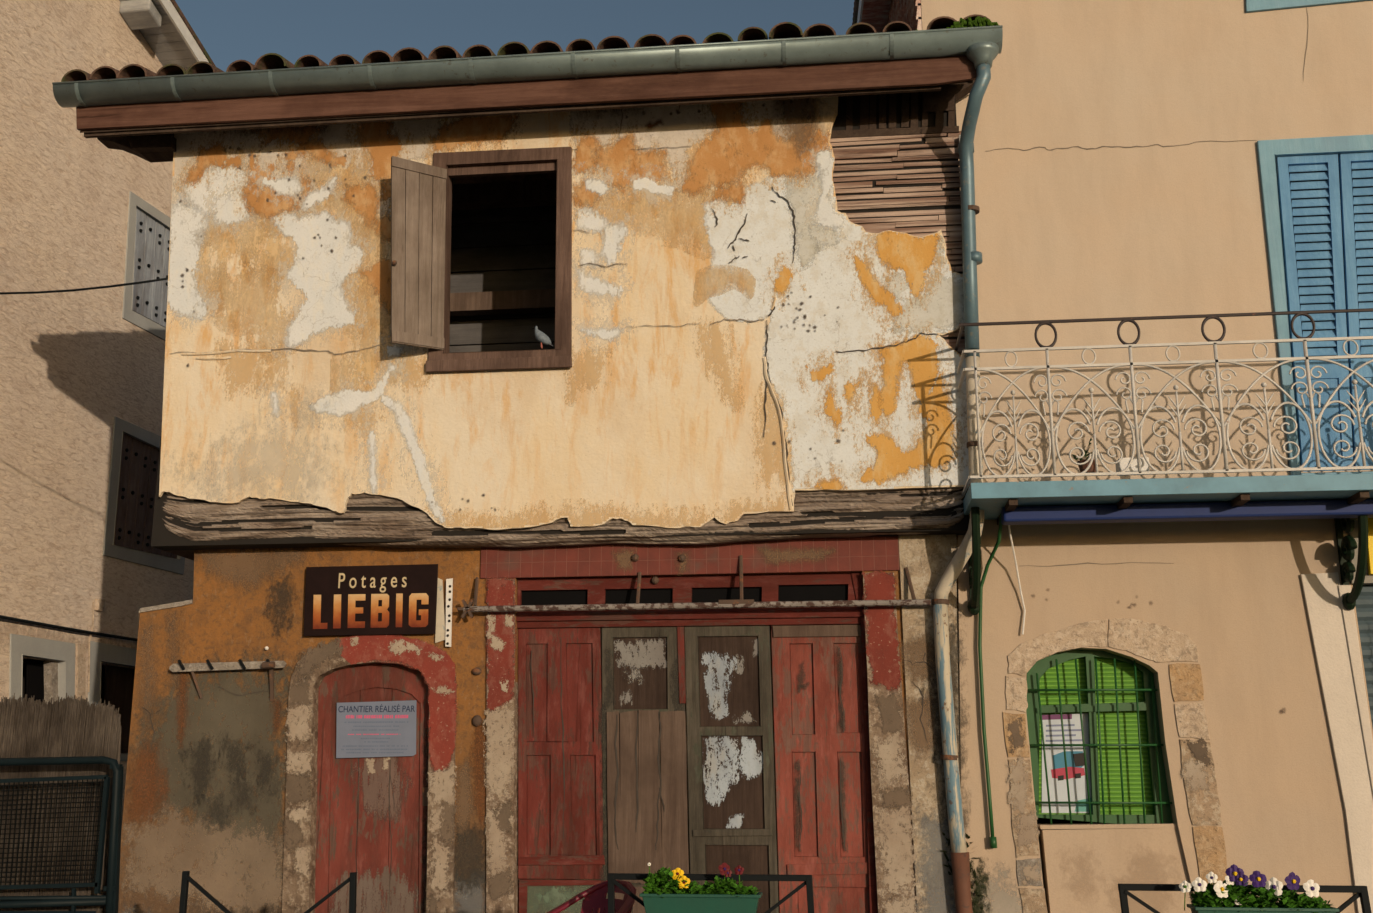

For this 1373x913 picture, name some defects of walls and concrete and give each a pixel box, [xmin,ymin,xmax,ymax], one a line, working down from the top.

crack [991,140,1256,151]
crack [170,343,386,355]
flaking render [167,115,520,524]
crack [627,306,793,506]
flaking render [569,99,969,494]
water stain [194,548,306,637]
water stain [121,616,302,913]
peeling [282,635,458,913]
peeling [483,576,616,913]